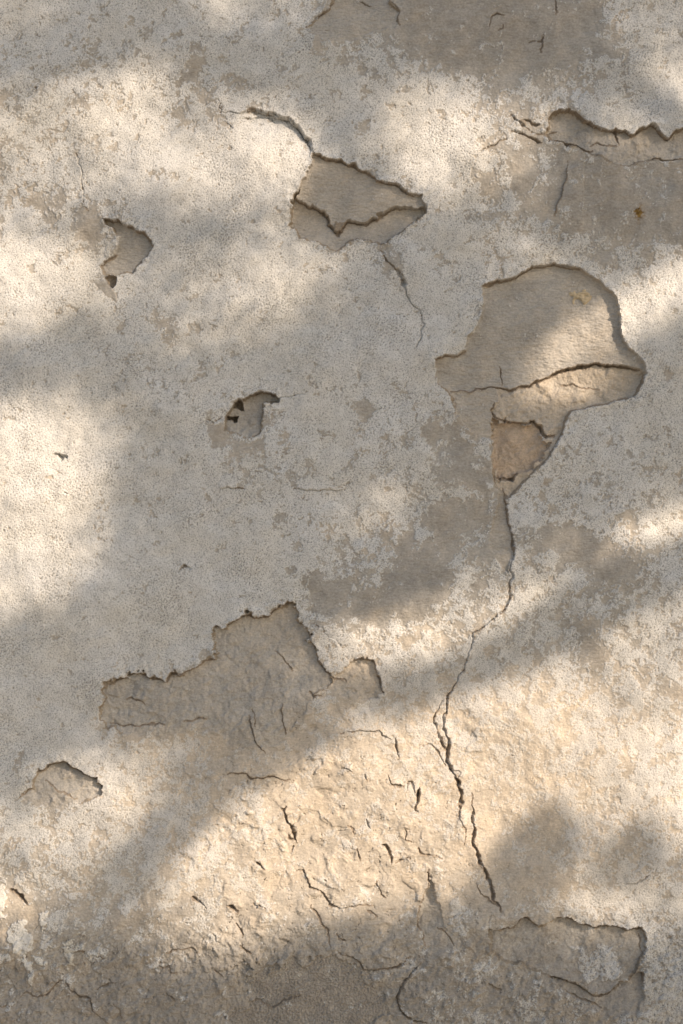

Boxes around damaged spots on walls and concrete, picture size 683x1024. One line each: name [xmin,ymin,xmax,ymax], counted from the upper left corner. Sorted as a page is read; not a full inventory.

spalling [68,201,154,304]
spalling [288,153,428,252]
crack [380,250,426,349]
peeling [545,106,683,245]
spalling [205,391,307,453]
spalling [420,262,648,501]
spalling [99,491,491,753]
crack [223,482,516,948]
spalling [19,761,104,807]
spalling [220,954,391,1024]
spalling [416,869,649,1019]